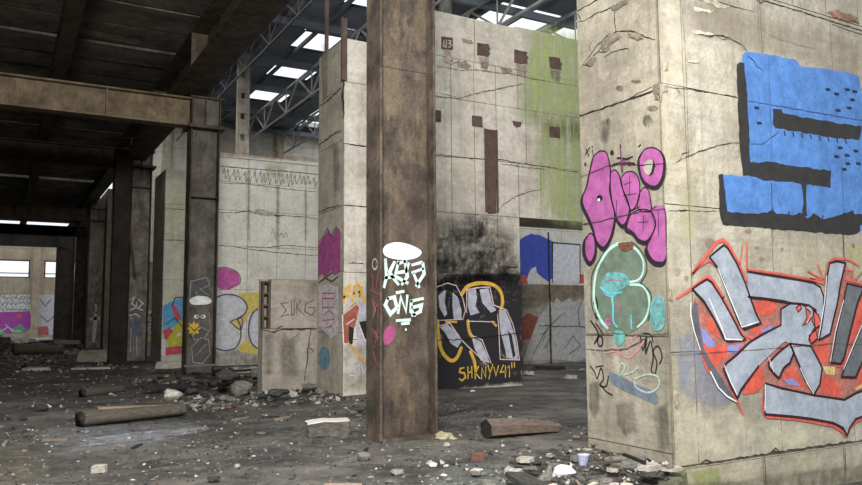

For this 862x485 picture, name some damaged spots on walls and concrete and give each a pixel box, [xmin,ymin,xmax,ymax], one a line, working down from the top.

damp [529,31,581,221]
crack [436,0,862,231]
crack [583,192,710,274]